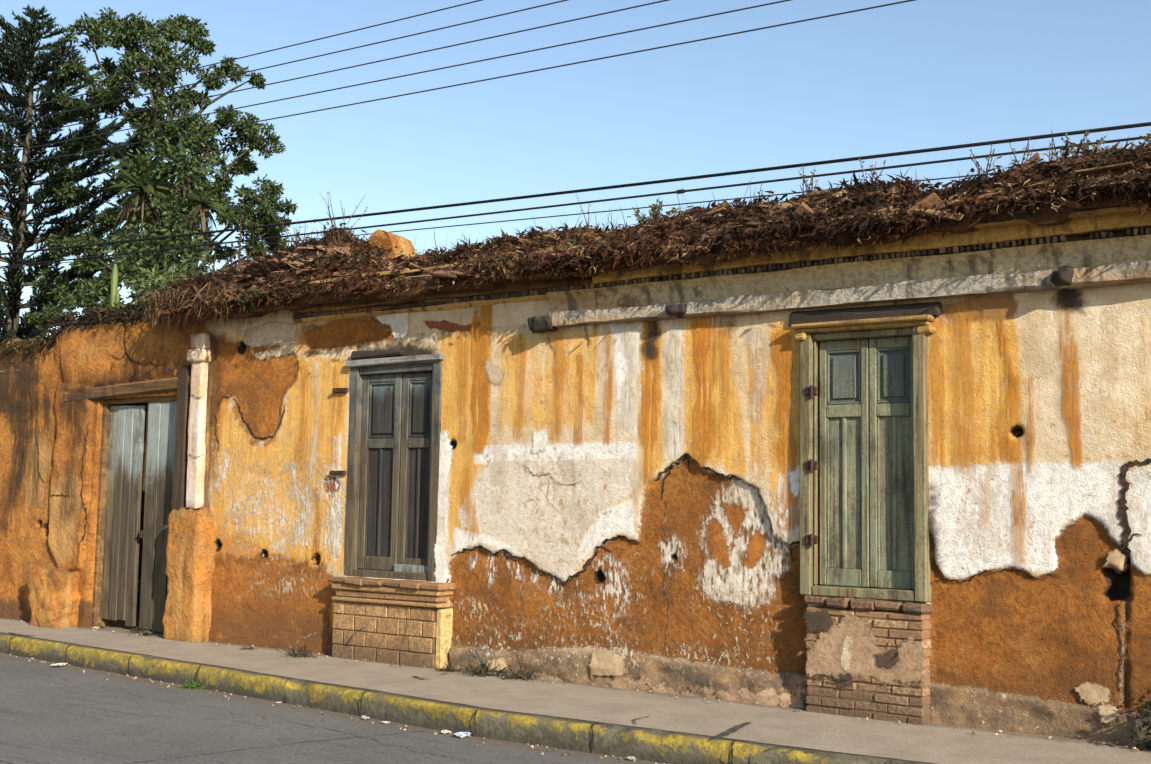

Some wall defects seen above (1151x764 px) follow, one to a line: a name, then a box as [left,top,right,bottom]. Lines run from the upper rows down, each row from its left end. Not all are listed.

leakage [0,344,43,522]
flaking render [213,313,409,445]
flaking render [425,320,480,332]
leakage [622,321,683,456]
leakage [942,295,1018,321]
leakage [1057,289,1083,310]
flaking render [209,436,347,654]
crack [452,535,637,634]
crack [655,453,800,651]
flaking render [434,431,1151,742]
crack [1113,601,1131,700]
crack [1117,458,1151,565]